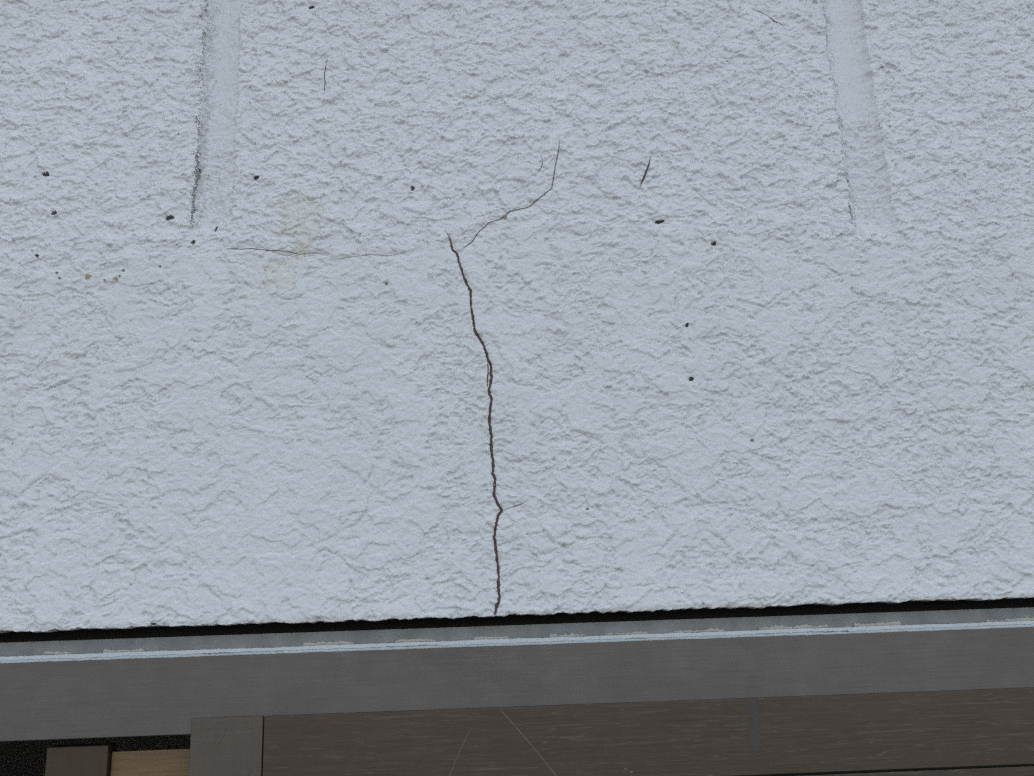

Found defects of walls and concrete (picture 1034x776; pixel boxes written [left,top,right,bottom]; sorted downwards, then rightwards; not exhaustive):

crack [228,244,405,261]
crack [445,142,560,615]